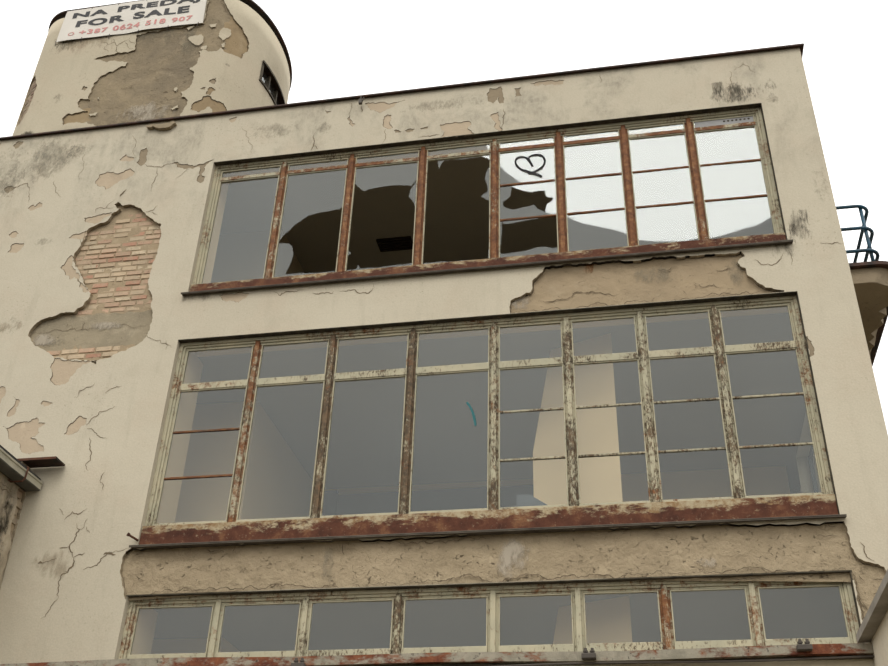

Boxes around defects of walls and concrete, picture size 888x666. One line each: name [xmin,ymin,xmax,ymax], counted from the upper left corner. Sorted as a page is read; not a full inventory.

spalling [62,0,249,126]
peeling [365,102,428,133]
peeling [440,121,474,138]
peeling [487,87,504,131]
spalling [28,202,161,385]
spalling [509,251,784,313]
peeling [3,399,45,454]
peeling [65,416,87,435]
crack [76,383,120,489]
crack [38,509,129,618]